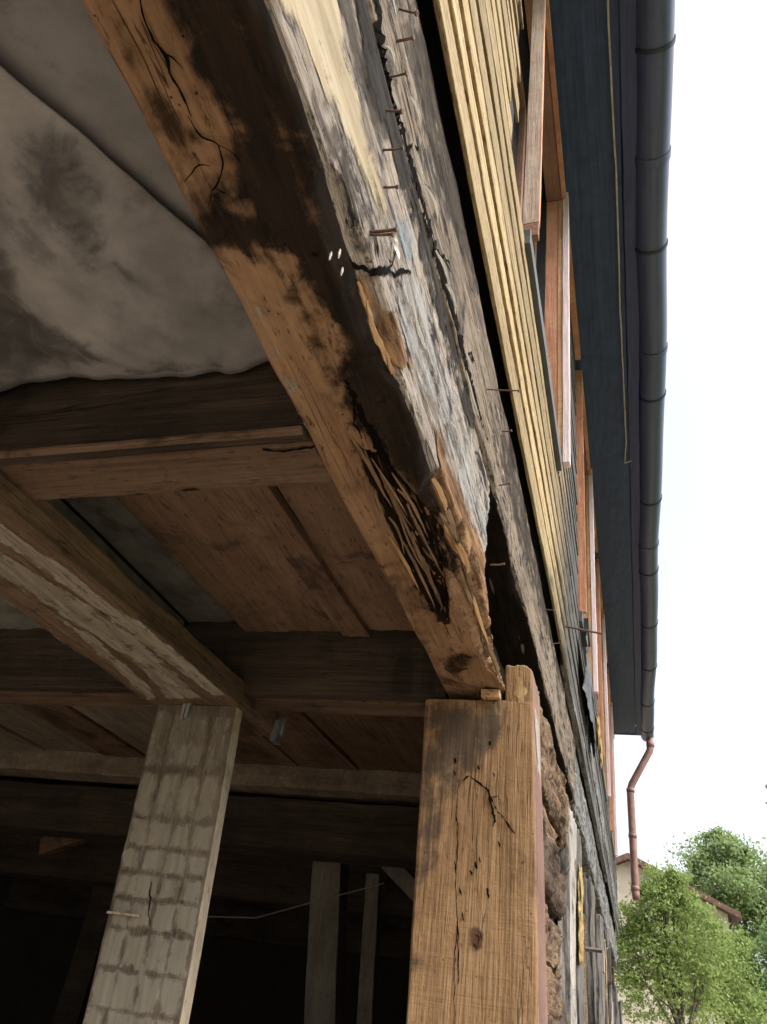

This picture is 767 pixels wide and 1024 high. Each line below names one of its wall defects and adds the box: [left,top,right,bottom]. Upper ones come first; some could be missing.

crack [140,0,242,207]
peeling [385,45,420,123]
crack [351,226,411,278]
peeling [412,142,439,222]
crack [374,0,488,440]
peeling [435,250,457,314]
peeling [463,345,480,419]
spalling [348,433,501,678]
crack [453,775,515,1018]